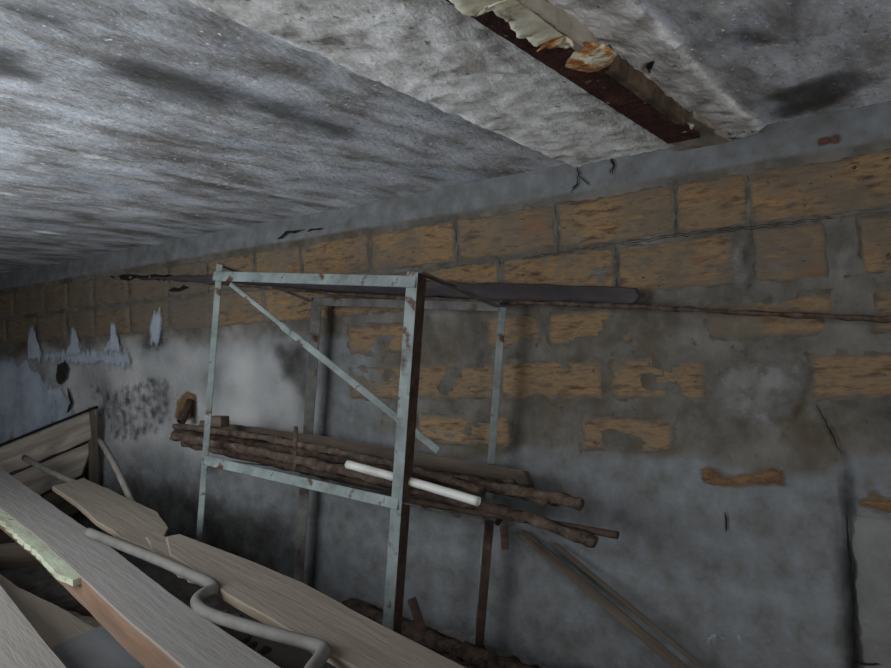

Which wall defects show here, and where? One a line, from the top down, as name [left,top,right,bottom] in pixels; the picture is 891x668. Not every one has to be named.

peeling [449,0,574,52]
crack [500,166,890,264]
crack [815,403,842,454]
crack [844,490,881,668]